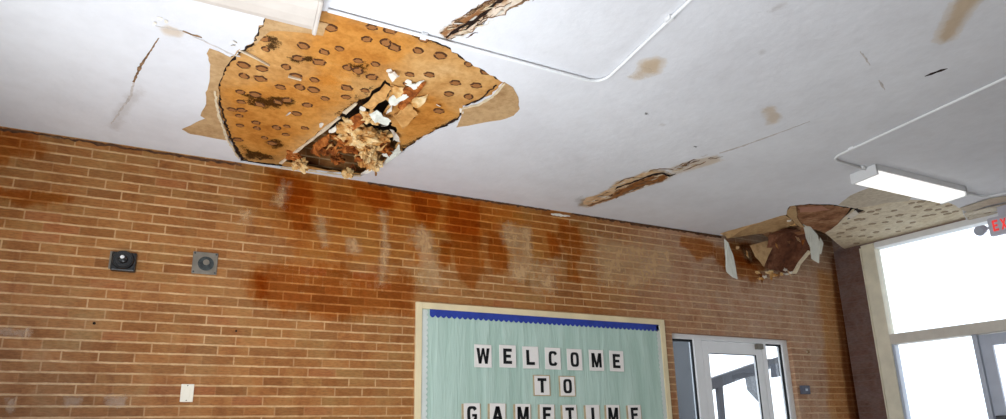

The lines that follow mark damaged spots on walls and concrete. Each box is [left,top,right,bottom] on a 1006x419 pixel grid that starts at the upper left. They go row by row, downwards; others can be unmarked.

crack [440,0,529,39]
crack [0,17,242,166]
spalling [182,11,520,179]
crack [368,121,810,238]
spalling [755,268,793,280]
peeling [825,187,1006,249]